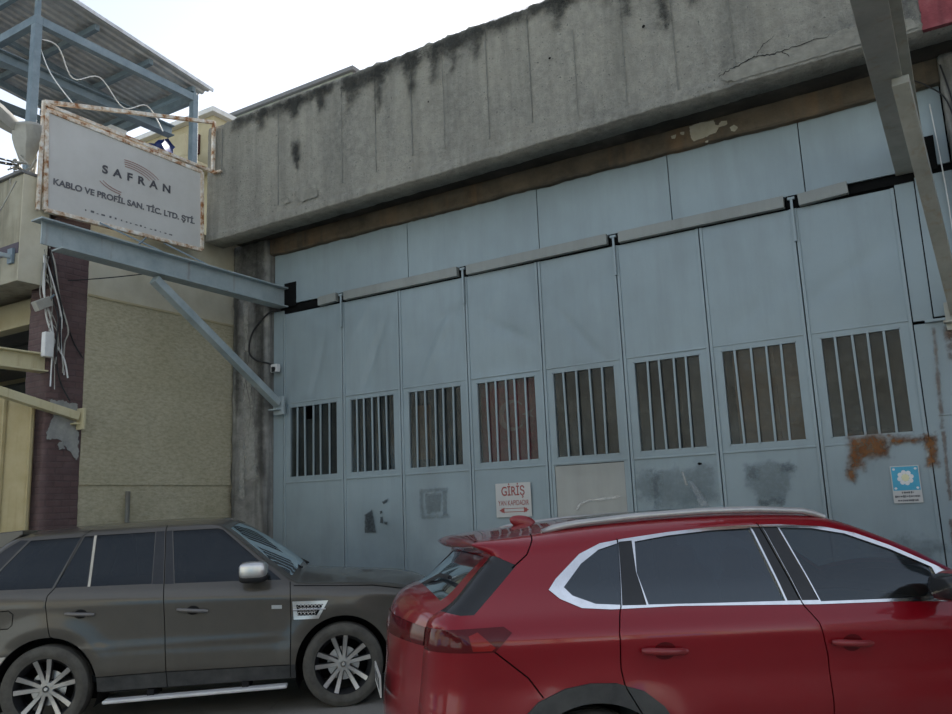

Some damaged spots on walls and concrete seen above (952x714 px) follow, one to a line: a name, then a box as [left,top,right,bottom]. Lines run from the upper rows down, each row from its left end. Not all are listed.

damp [232,0,571,128]
peeling [671,120,738,143]
peeling [46,399,79,460]
rust [847,432,951,500]